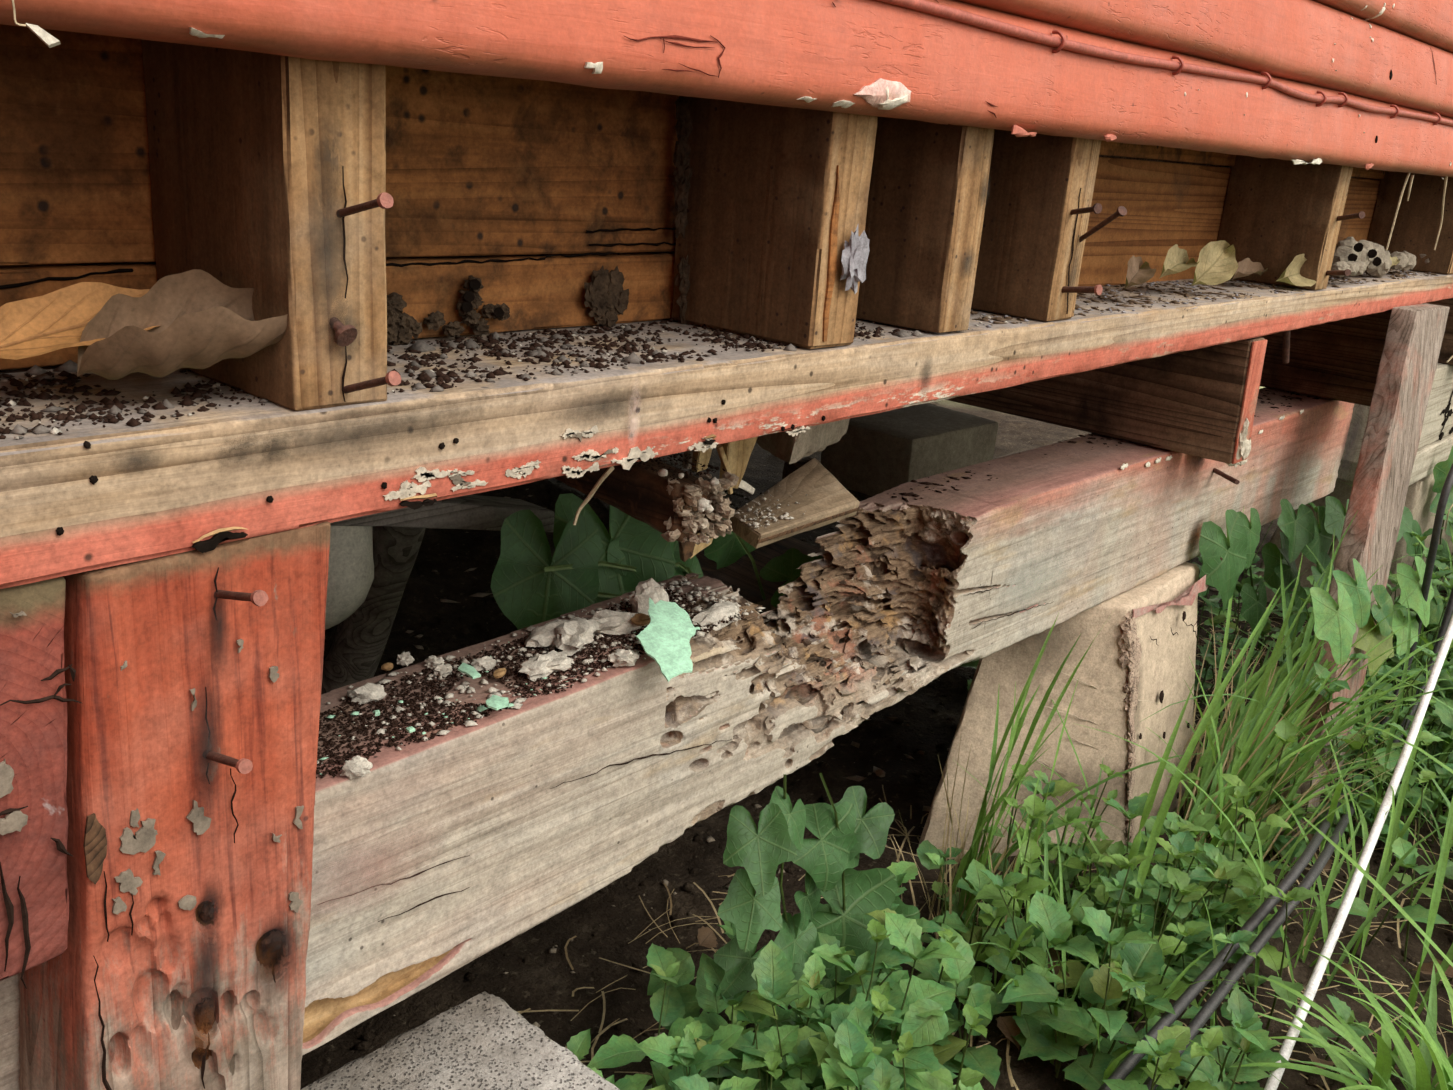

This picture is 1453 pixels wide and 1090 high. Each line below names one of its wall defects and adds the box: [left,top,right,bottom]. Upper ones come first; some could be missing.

crack [624,35,726,78]
peeling [560,425,658,478]
peeling [676,436,719,454]
peeling [786,426,811,437]
peeling [382,467,488,501]
peeling [504,460,541,498]
peeling [735,546,937,729]
peeling [0,758,28,835]
crack [0,806,28,816]
peeling [186,800,211,835]
crack [0,862,31,989]
crack [50,837,134,1090]